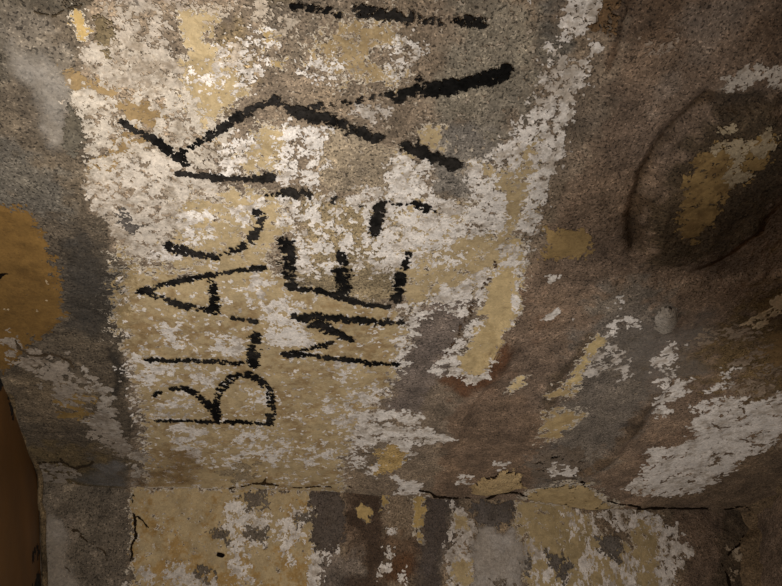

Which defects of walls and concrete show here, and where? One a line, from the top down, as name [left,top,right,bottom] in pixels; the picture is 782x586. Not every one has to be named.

peeling [0,0,621,586]
peeling [442,294,782,586]
leakage [620,326,711,383]
peeling [672,122,781,245]